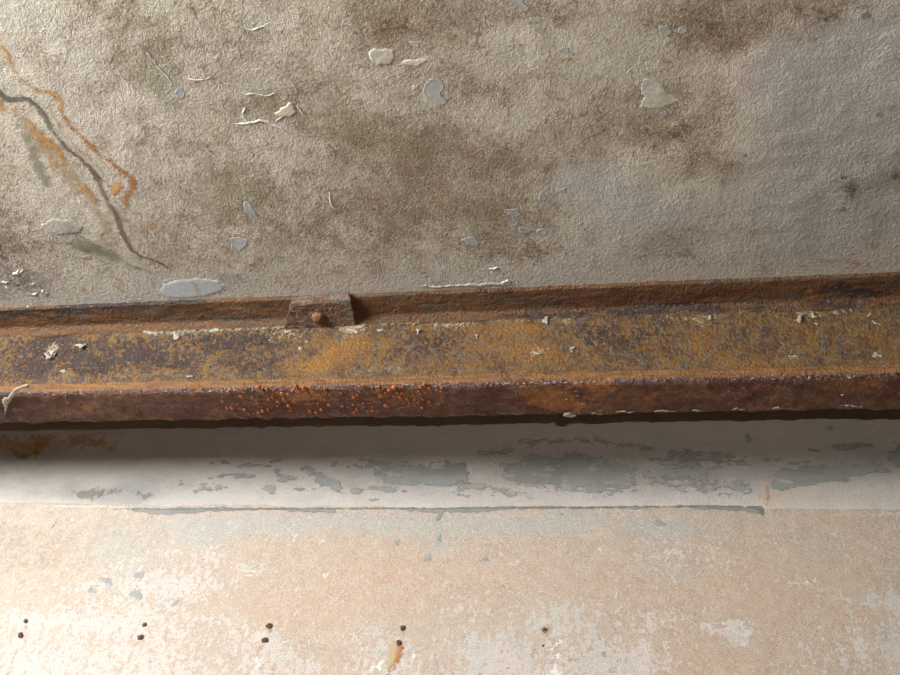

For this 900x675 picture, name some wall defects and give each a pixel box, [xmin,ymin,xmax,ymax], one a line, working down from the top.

peeling [234,102,306,133]
corrosion [22,86,140,214]
crack [0,90,168,268]
corrosion [221,382,446,414]
peeling [192,437,752,501]
peeling [766,443,900,491]
corrosion [387,642,404,671]